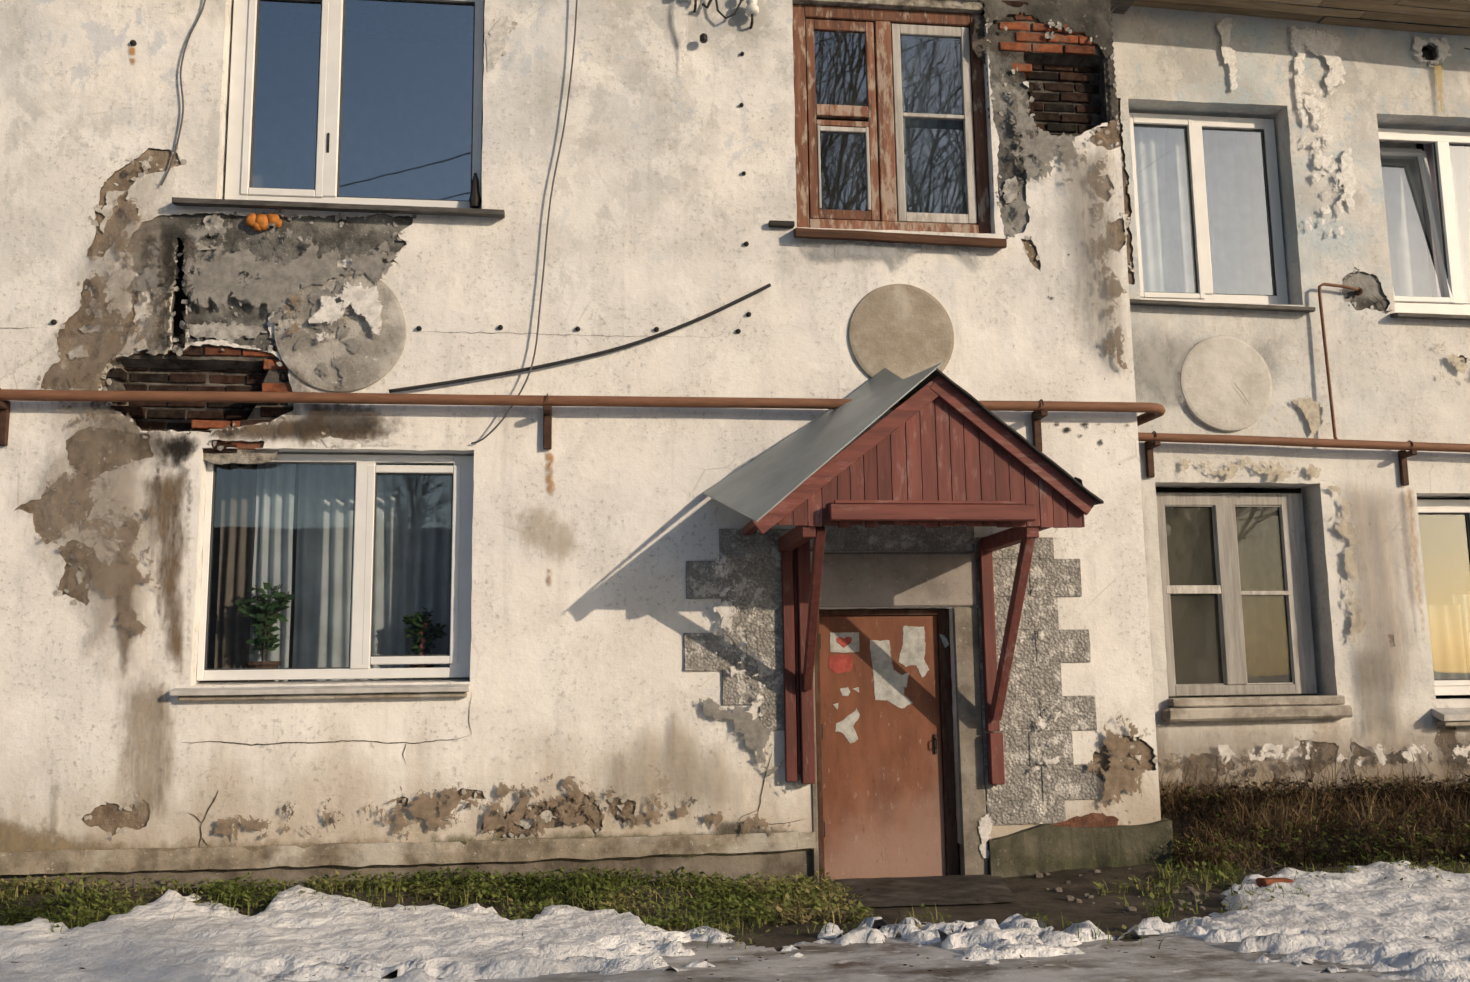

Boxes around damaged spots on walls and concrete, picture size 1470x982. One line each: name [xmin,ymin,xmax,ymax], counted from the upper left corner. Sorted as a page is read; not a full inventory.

peeling [1217,17,1239,90]
peeling [1289,26,1356,237]
peeling [967,0,1136,372]
peeling [16,144,417,636]
peeling [1436,342,1470,384]
damp [45,222,184,665]
crack [183,701,471,763]
peeling [1087,715,1470,825]
flaking render [76,790,154,841]
peeling [214,806,341,846]
peeling [363,773,804,843]